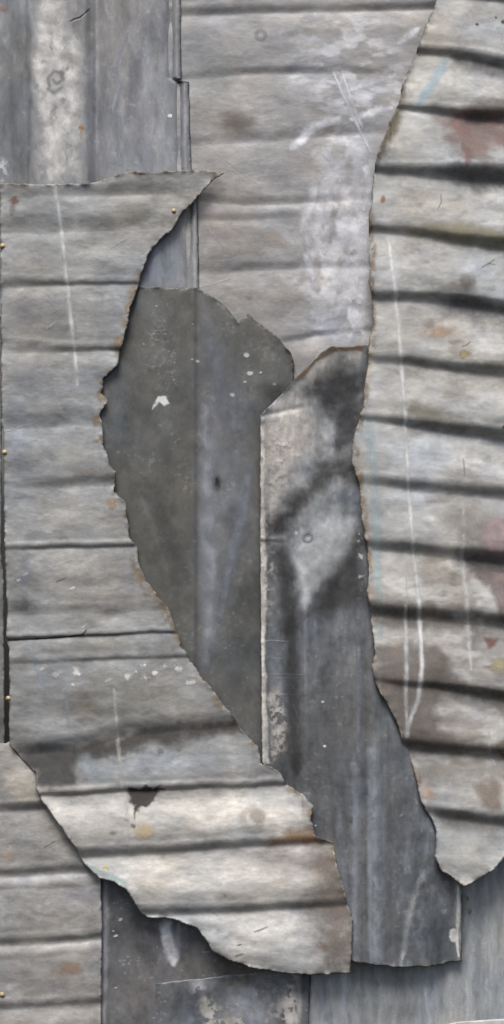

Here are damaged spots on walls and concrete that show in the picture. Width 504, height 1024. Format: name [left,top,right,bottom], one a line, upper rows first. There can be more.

damp [313,369,358,447]
peeling [260,415,291,764]
damp [266,466,360,774]
peeling [124,664,196,685]
peeling [128,785,165,813]
damp [353,743,380,964]
peeling [449,885,460,957]